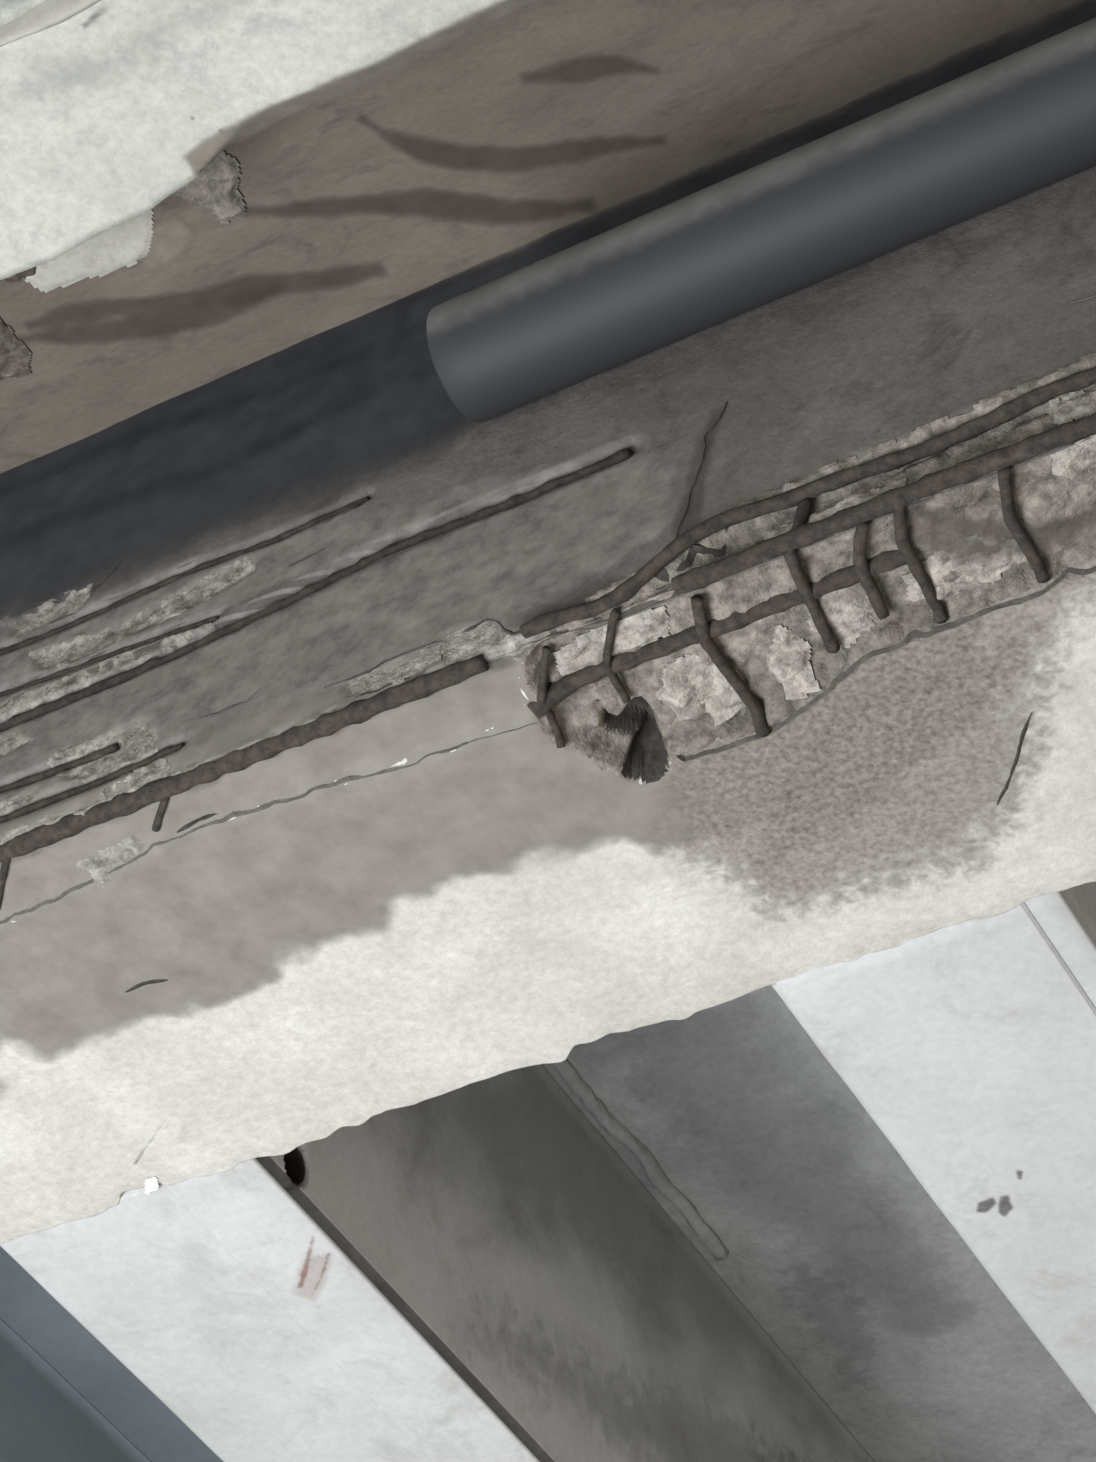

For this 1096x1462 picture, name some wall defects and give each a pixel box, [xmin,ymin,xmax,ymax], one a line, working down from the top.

spalling [0,319,32,381]
peeling [4,210,192,293]
spalling [172,151,246,225]
damp [0,0,1096,613]
damp [0,621,713,1057]
spalling [0,353,1096,924]